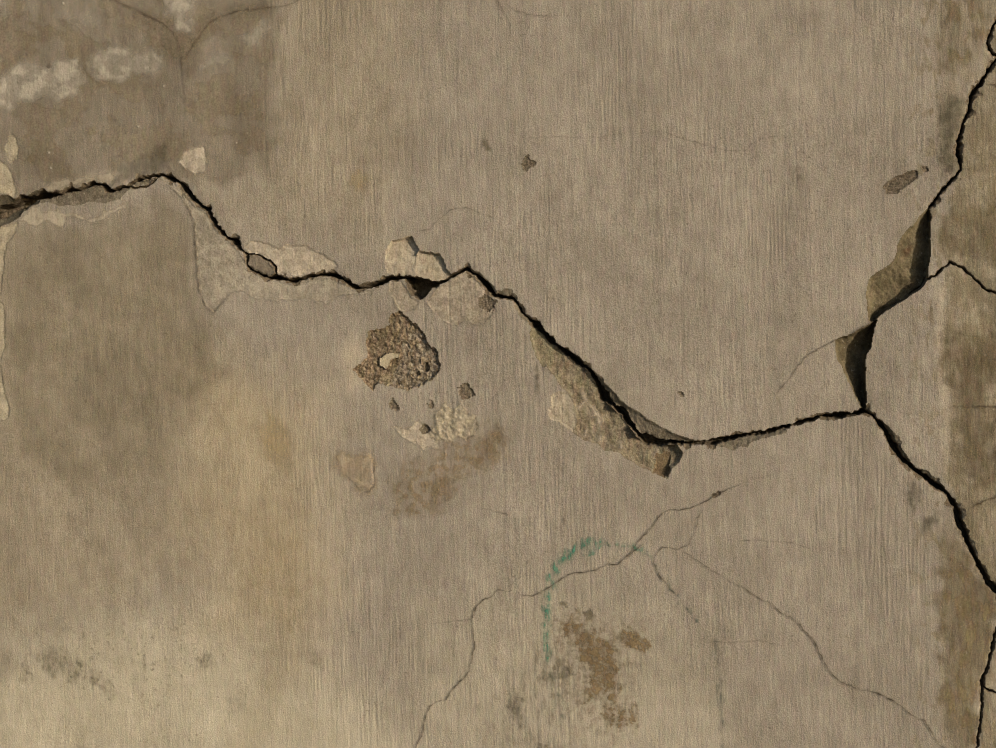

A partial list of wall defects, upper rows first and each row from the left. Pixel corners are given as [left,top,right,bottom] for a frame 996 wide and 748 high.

peeling [0,135,19,197]
peeling [179,146,206,174]
peeling [163,179,372,310]
spalling [883,166,929,194]
crack [926,15,996,239]
spalling [353,236,498,411]
peeling [394,383,476,450]
crack [0,172,996,601]
spalling [529,327,683,479]
crack [415,594,494,748]
crack [747,590,933,734]
crack [975,626,996,748]